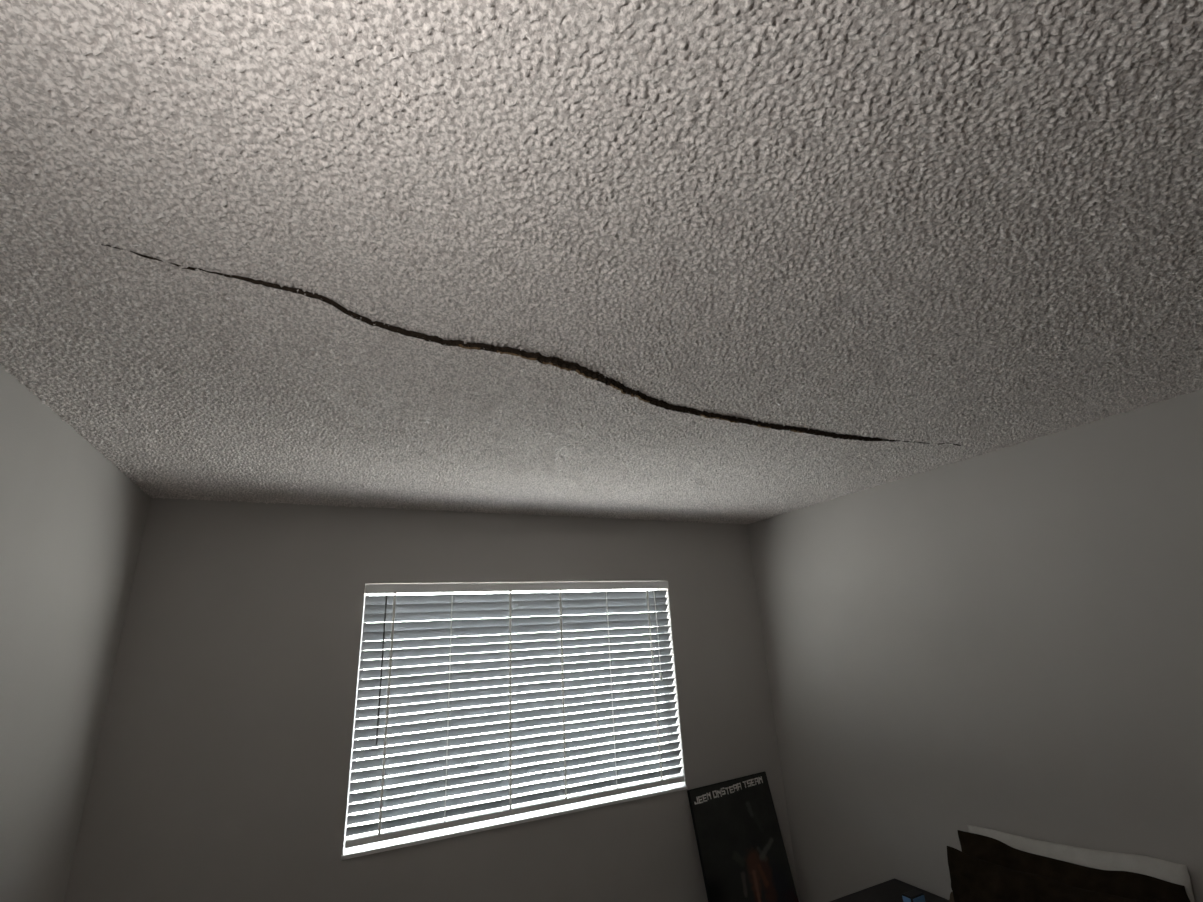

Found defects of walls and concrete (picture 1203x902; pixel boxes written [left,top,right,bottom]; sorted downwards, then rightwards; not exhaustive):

crack [101,244,961,446]